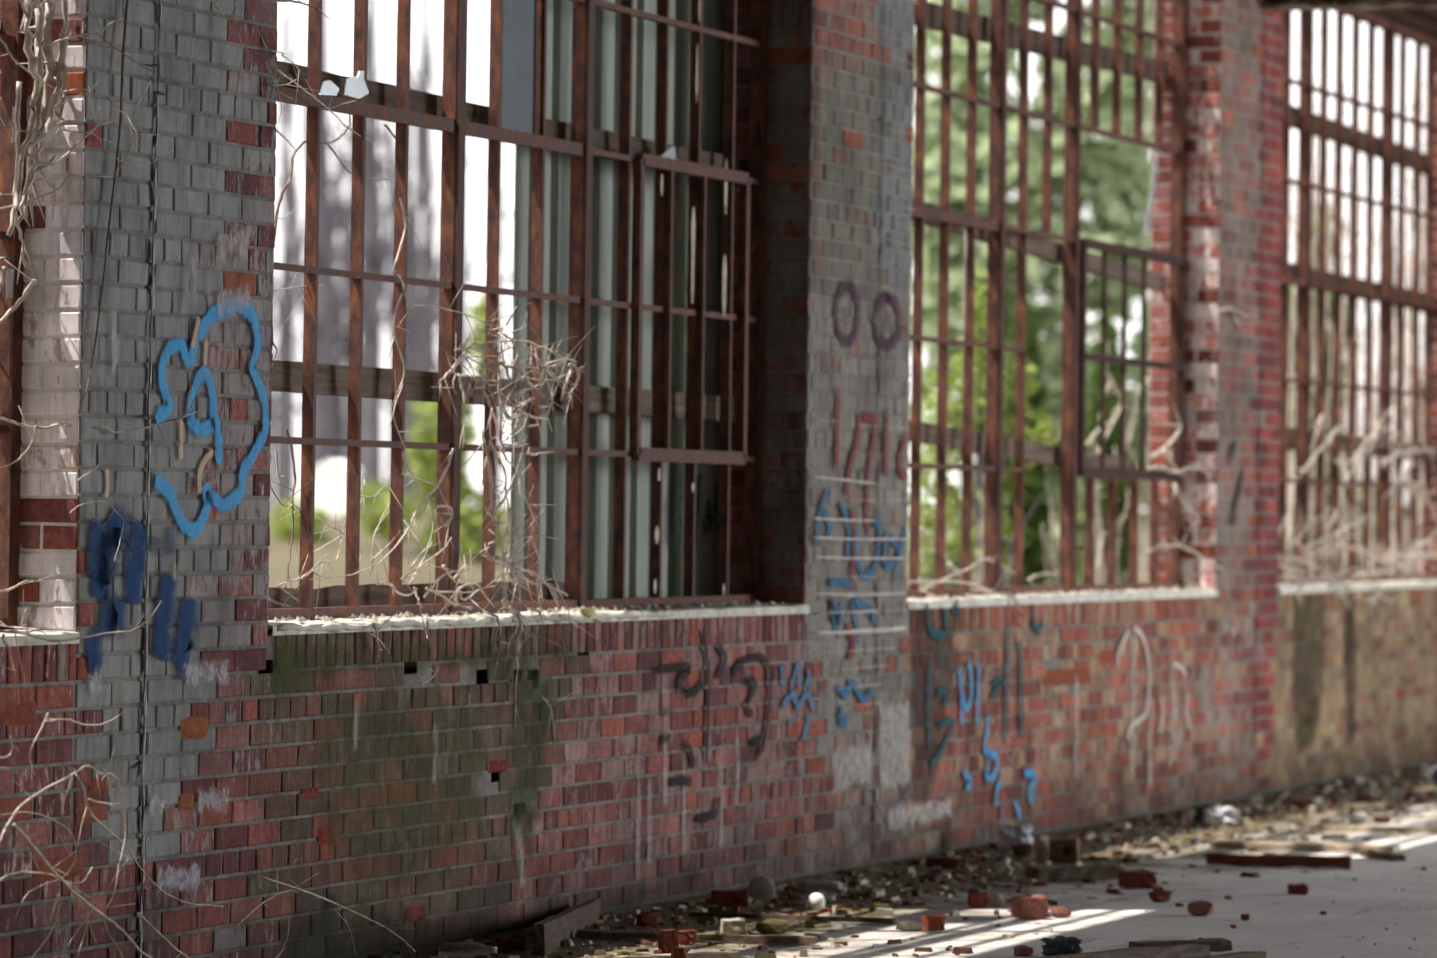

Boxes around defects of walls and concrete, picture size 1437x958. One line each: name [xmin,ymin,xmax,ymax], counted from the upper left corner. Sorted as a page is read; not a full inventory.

crack [128,0,171,958]